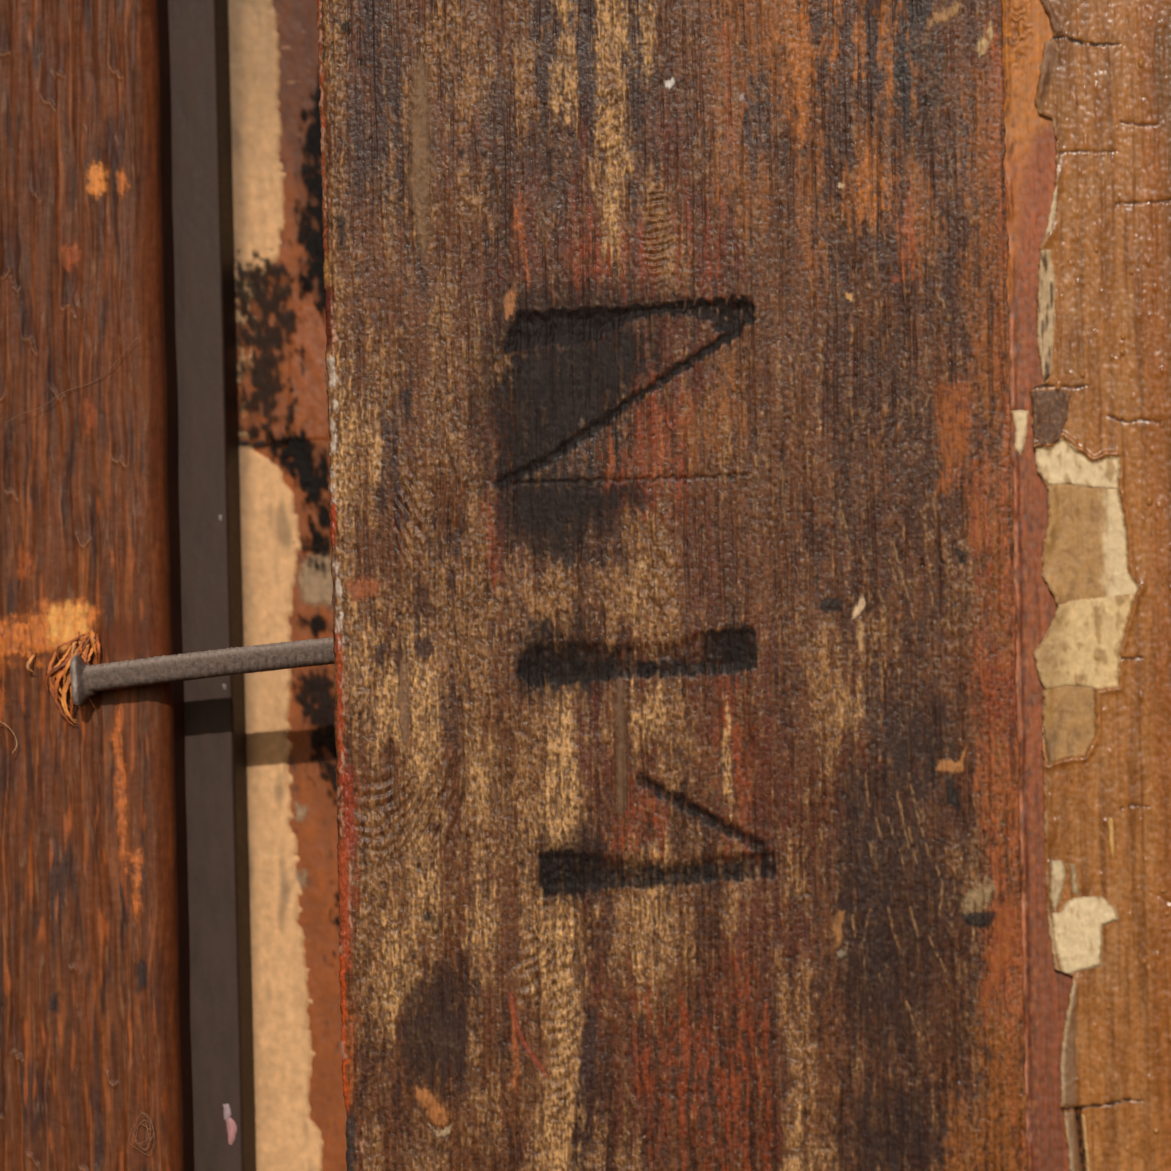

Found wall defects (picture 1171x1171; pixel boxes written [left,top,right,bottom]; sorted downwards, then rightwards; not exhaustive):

damp [235,67,331,570]
peeling [1036,0,1063,111]
peeling [1045,186,1058,235]
peeling [1011,249,1139,764]
peeling [1047,860,1119,1171]